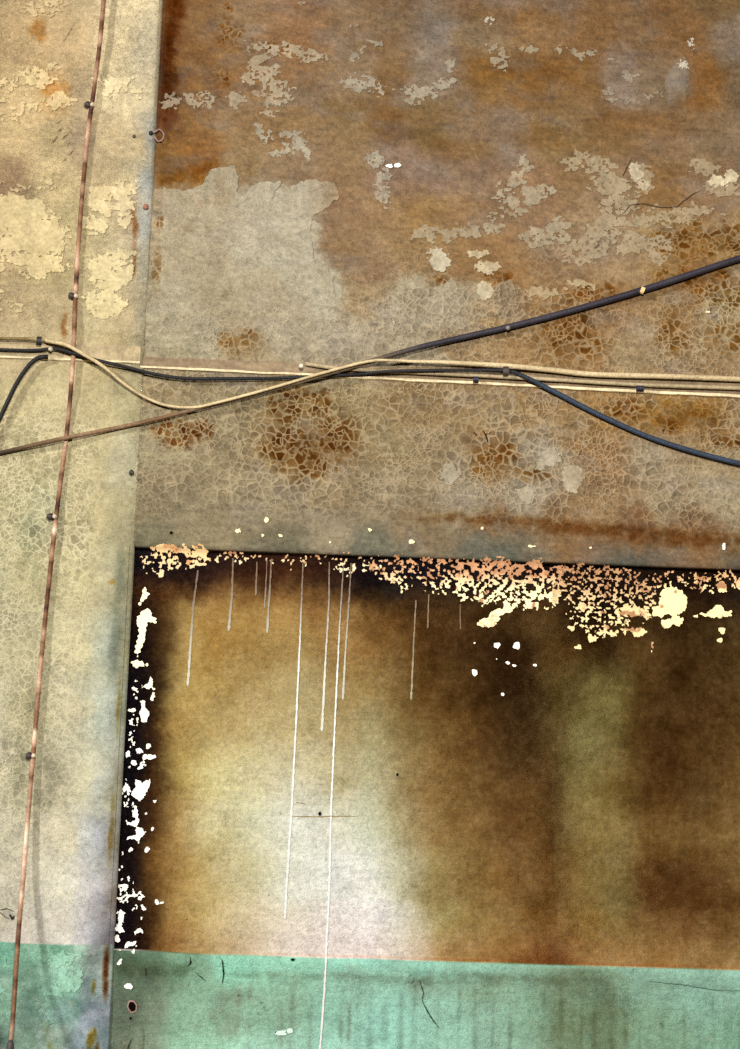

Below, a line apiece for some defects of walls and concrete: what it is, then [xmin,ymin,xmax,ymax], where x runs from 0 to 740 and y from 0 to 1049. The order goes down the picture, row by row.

peeling [0,61,78,123]
peeling [91,76,142,99]
peeling [0,177,140,280]
peeling [79,248,137,320]
flaking render [157,148,740,343]
corrosion [158,422,211,445]
corrosion [263,390,349,476]
peeling [140,531,740,653]
peeling [115,587,164,965]
water stain [155,558,356,1049]
water stain [369,583,740,969]